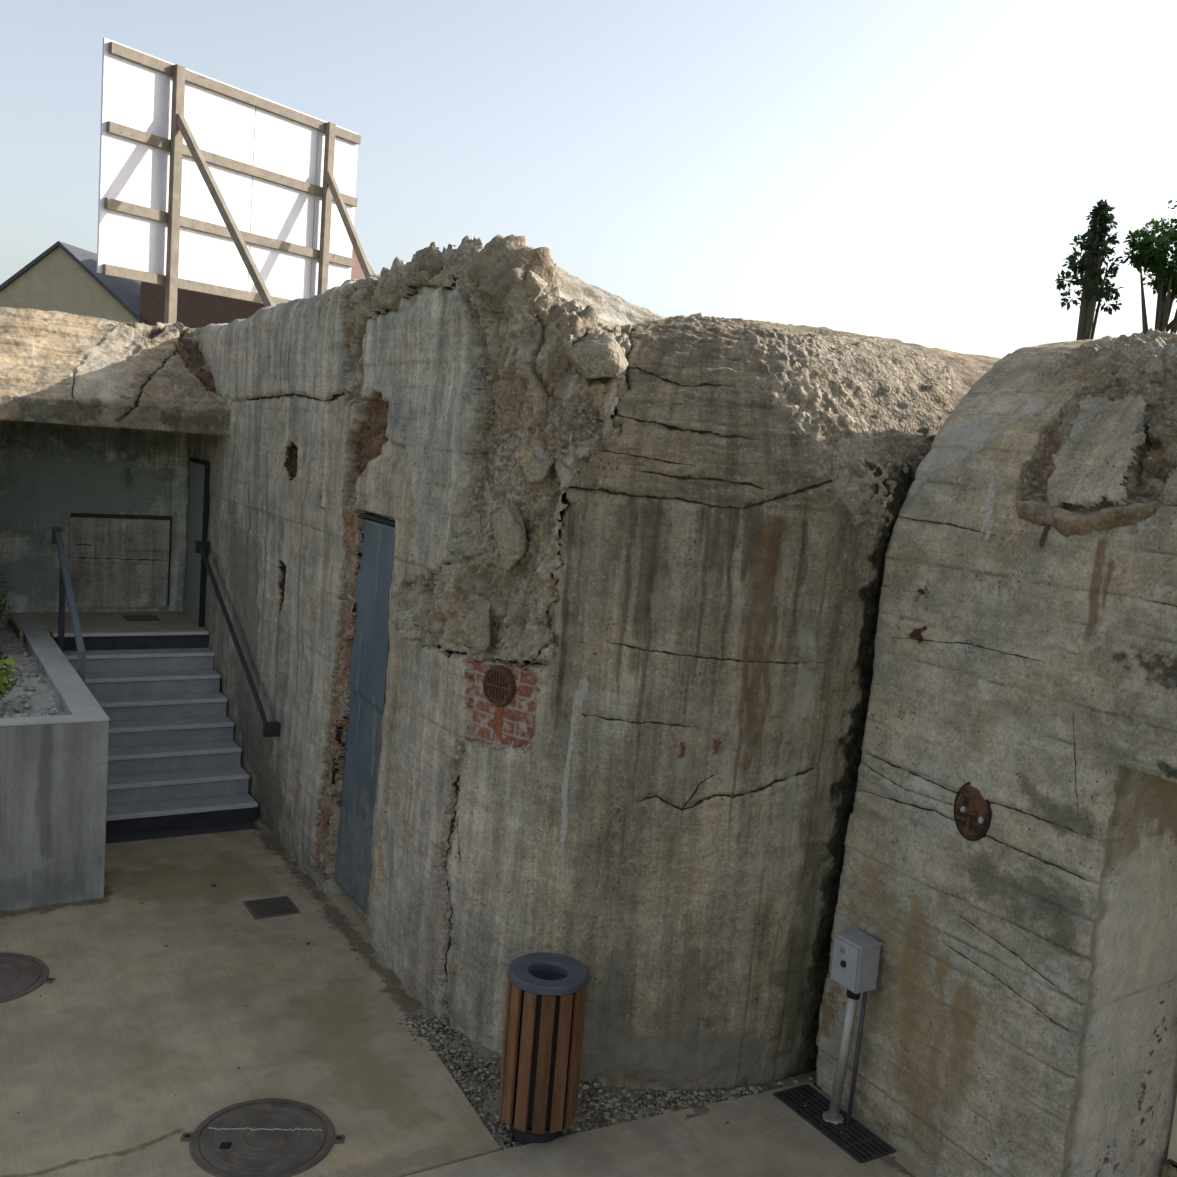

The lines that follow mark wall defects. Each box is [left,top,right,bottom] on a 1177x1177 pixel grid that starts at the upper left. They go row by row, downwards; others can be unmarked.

crack [119,331,185,421]
crack [568,414,833,509]
spalling [1015,355,1177,537]
spalling [314,234,633,881]
corrosion [909,626,927,643]
mould [1112,648,1177,688]
crack [641,767,815,811]
leakage [581,400,1046,1087]
crack [859,753,957,821]
crack [443,749,465,1019]
crack [986,835,1093,883]
crack [945,915,1072,1034]